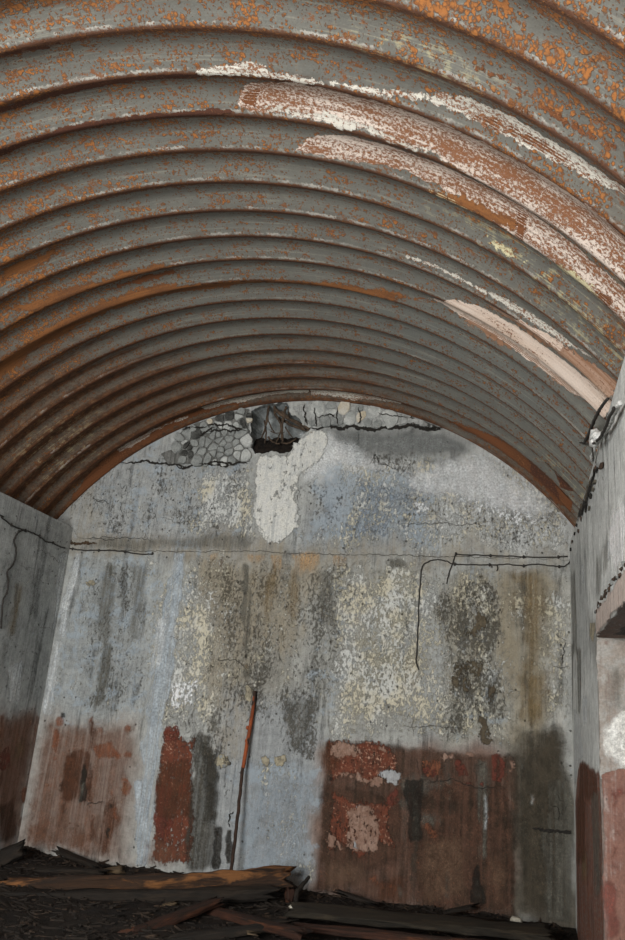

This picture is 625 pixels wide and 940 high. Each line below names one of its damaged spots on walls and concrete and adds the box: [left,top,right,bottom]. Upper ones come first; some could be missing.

rust [0,73,200,113]
rust [0,107,235,156]
peeling [195,60,625,323]
rust [0,263,418,383]
peeling [405,254,617,419]
rust [72,390,401,503]
peeling [161,401,440,544]
crack [310,416,442,473]
damp [596,504,625,577]
damp [95,643,111,706]
damp [134,538,245,870]
damp [513,572,587,920]